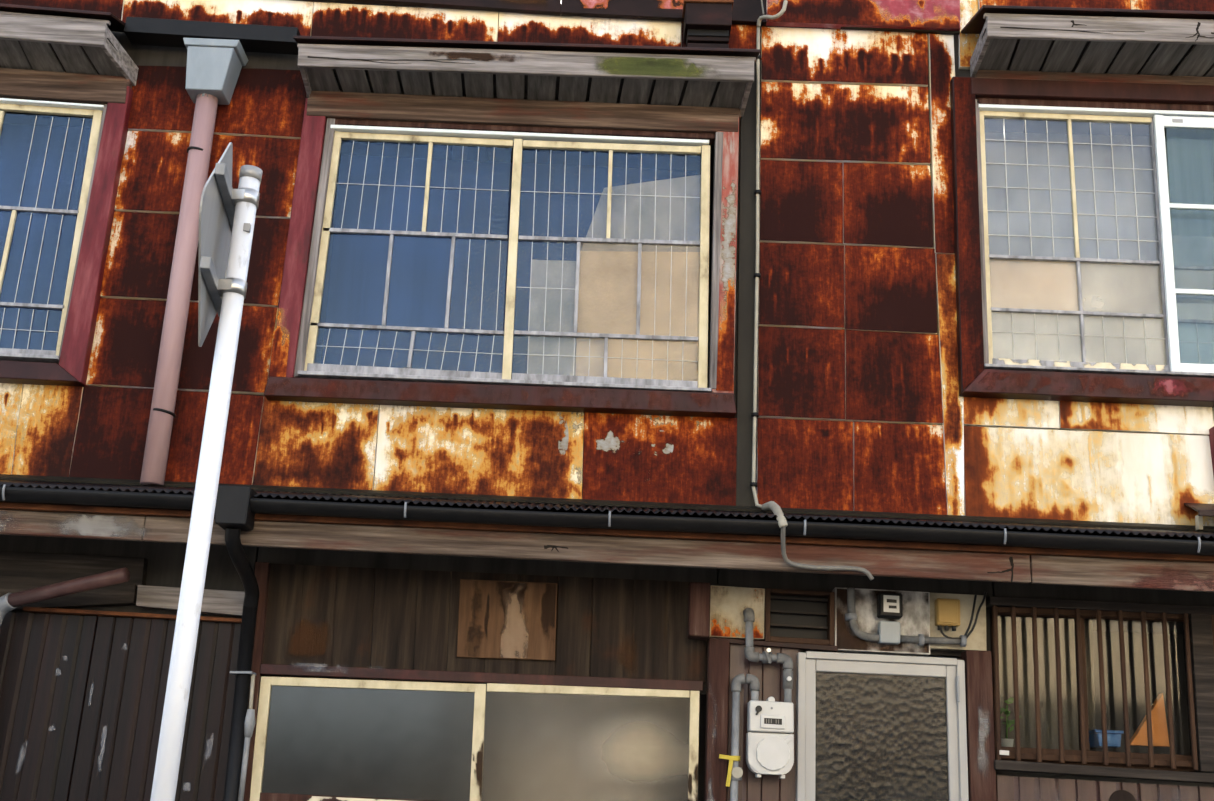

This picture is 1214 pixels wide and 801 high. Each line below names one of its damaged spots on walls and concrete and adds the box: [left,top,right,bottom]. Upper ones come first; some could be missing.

corrosion [0,0,686,47]
corrosion [0,66,196,480]
corrosion [207,68,737,506]
corrosion [728,0,1214,526]
corrosion [165,240,220,482]
peeling [558,412,583,455]
peeling [596,431,624,453]
peeling [639,415,674,456]
corrosion [711,619,763,638]